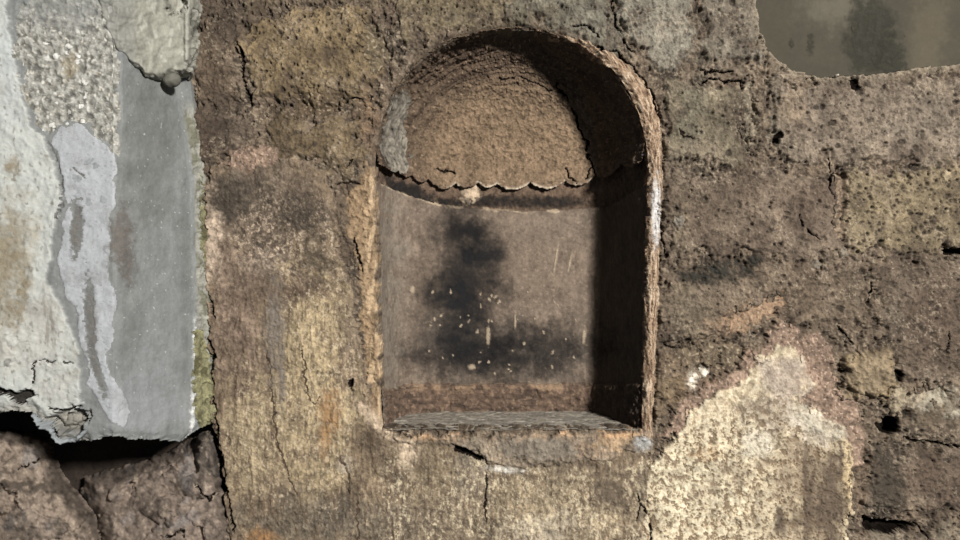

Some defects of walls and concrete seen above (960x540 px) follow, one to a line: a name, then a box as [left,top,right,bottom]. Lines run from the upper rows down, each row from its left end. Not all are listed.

flaking render [0,0,130,445]
water stain [439,198,486,240]
crack [195,339,236,531]
crack [482,457,490,522]
flaking render [202,144,865,540]